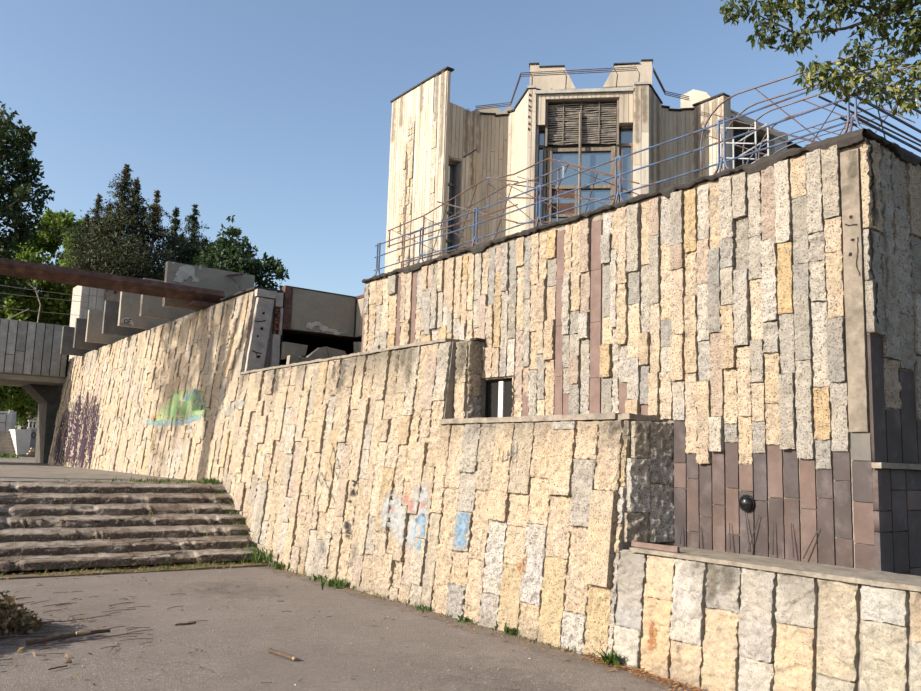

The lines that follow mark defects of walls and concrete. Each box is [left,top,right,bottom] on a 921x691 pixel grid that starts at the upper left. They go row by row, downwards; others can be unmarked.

peeling [172,262,202,284]
peeling [306,321,345,335]